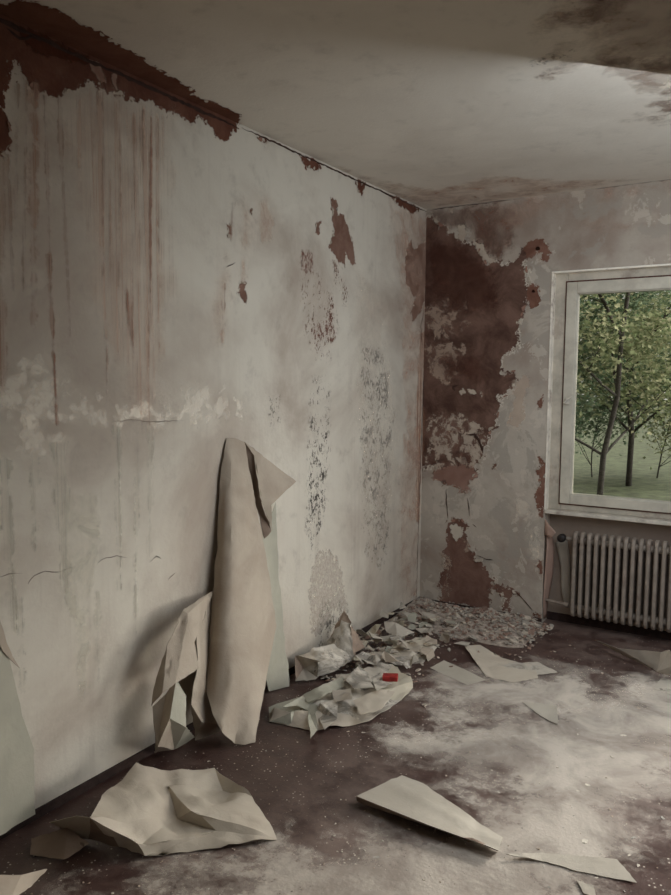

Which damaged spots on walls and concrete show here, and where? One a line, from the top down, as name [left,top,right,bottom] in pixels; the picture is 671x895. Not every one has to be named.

peeling [0,0,242,159]
leakage [143,128,153,305]
leakage [302,250,347,357]
peeling [315,197,356,267]
leakage [305,382,329,549]
leakage [360,348,392,559]
peeling [405,214,552,618]